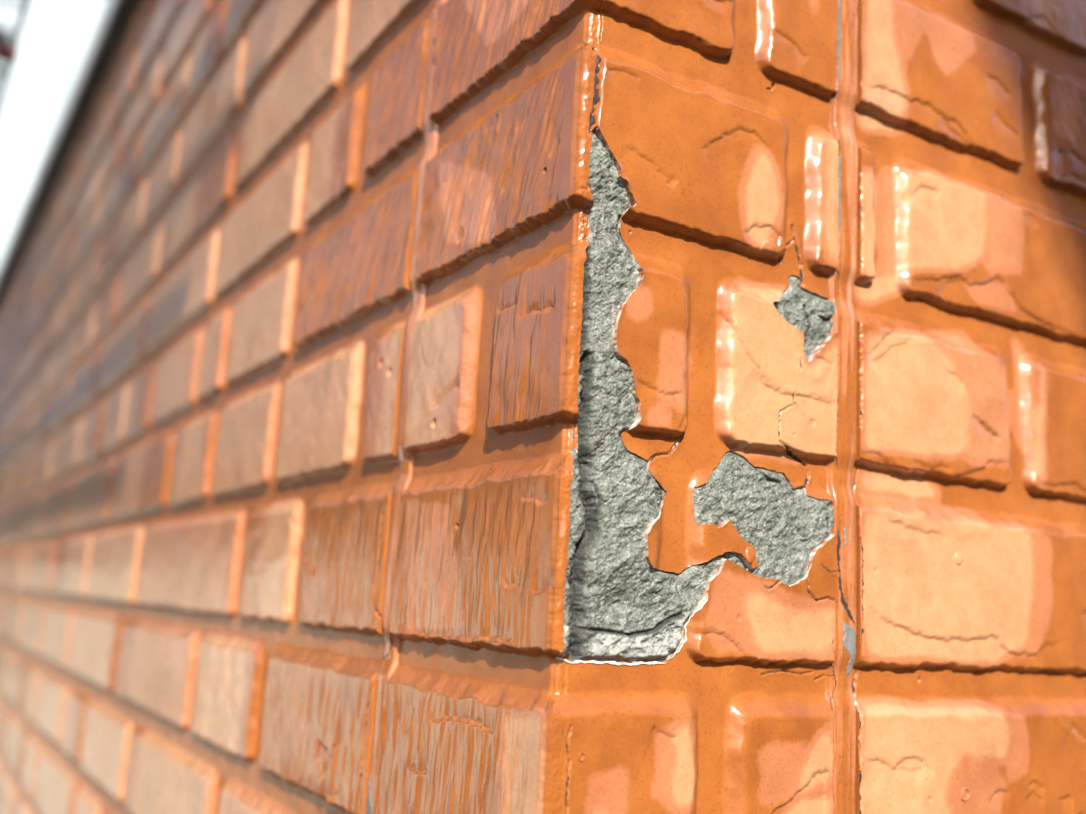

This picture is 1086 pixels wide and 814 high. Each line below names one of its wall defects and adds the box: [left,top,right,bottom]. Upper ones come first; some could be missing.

crack [786,226,803,285]
spalling [556,129,848,665]
crack [779,394,808,490]